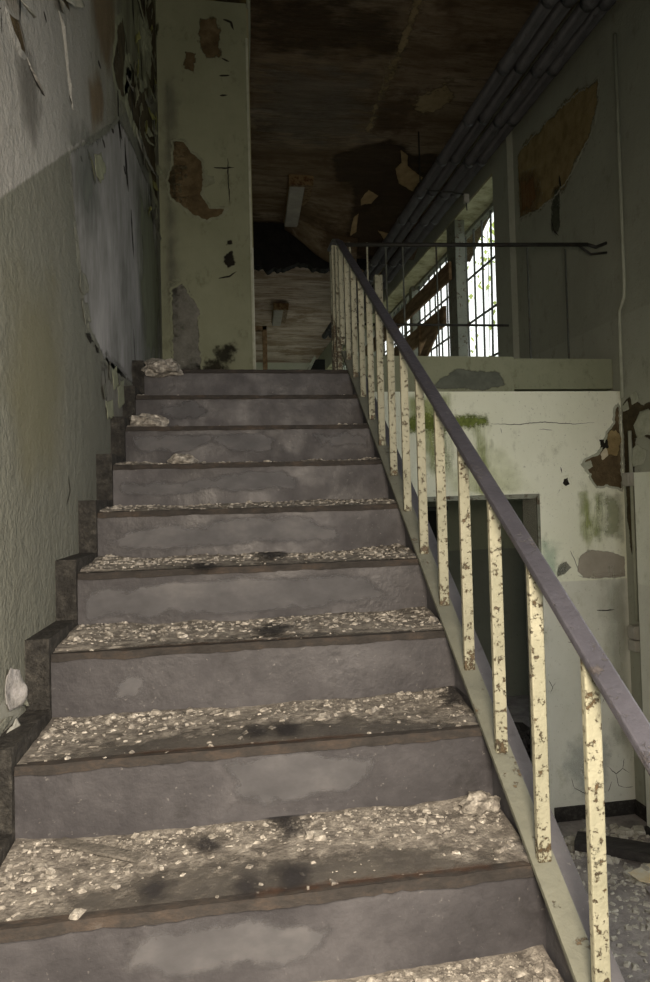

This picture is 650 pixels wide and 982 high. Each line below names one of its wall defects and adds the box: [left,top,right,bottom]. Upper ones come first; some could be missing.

peeling [5,0,37,61]
water stain [215,0,401,57]
peeling [69,0,229,419]
peeling [517,76,600,232]
flaking render [557,391,650,578]
peeling [0,667,29,736]